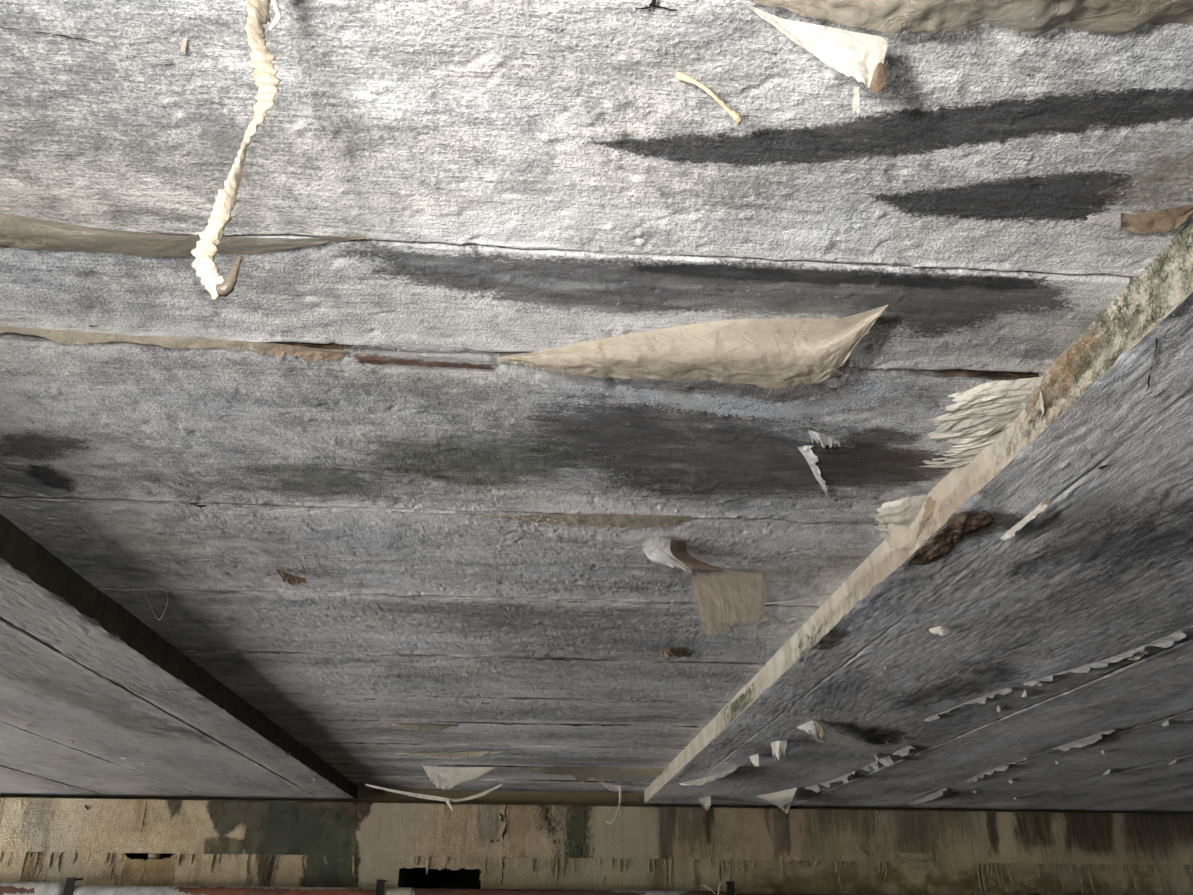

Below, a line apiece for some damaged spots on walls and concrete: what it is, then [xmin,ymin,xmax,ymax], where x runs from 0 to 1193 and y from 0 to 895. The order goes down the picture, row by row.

peeling [923,626,1193,722]
peeling [805,738,914,792]
peeling [908,758,1027,805]
peeling [1046,729,1115,764]
water stain [532,805,596,858]
water stain [658,807,675,859]
water stain [703,808,713,844]
water stain [764,809,790,854]
water stain [986,812,999,855]
water stain [1014,812,1193,862]
water stain [117,854,176,886]
rust [762,864,1107,895]